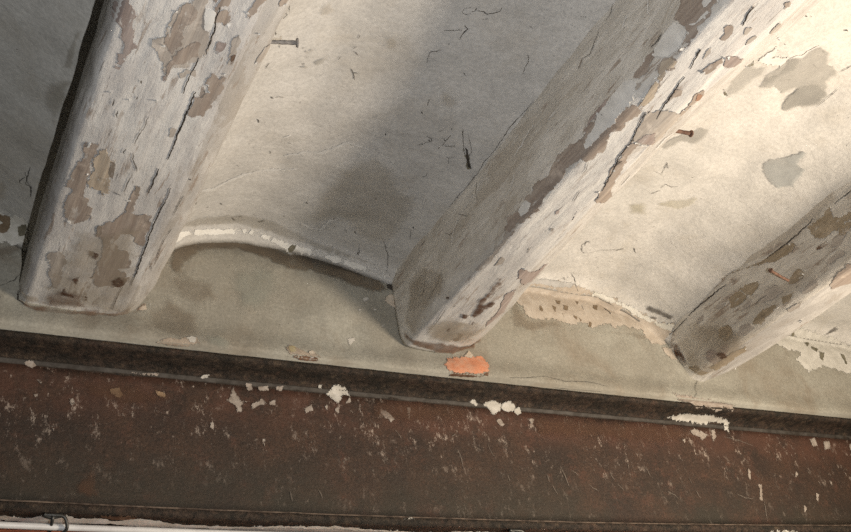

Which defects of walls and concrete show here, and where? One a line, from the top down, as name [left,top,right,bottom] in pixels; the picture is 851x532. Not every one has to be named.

peeling [111,0,138,70]
peeling [152,0,241,118]
peeling [702,22,820,75]
leakage [761,49,837,111]
peeling [64,142,154,288]
crack [112,8,220,310]
peeling [475,0,719,271]
leakage [764,152,806,188]
peeling [807,207,851,289]
peeling [486,263,678,360]
peeling [688,269,818,375]
peeling [777,320,851,374]